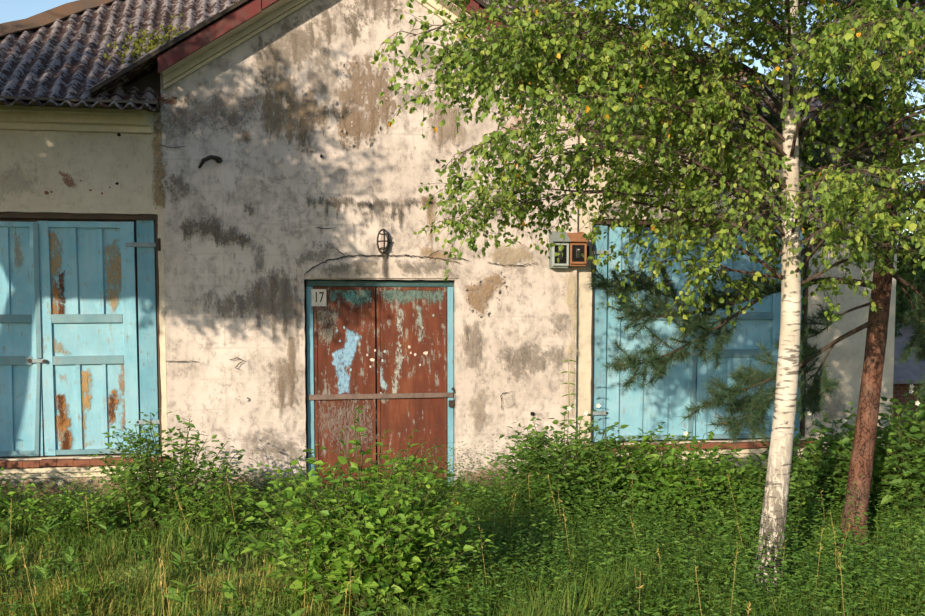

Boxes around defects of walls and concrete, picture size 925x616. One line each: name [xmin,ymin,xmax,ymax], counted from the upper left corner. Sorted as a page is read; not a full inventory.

water stain [251,0,403,99]
water stain [160,90,258,141]
rust [49,232,65,314]
rust [105,240,122,310]
water stain [179,215,250,251]
water stain [307,196,419,229]
water stain [297,242,453,278]
rust [55,369,92,450]
rust [107,365,126,429]
water stain [197,247,303,418]
peeling [317,286,444,394]
water stain [498,343,567,381]